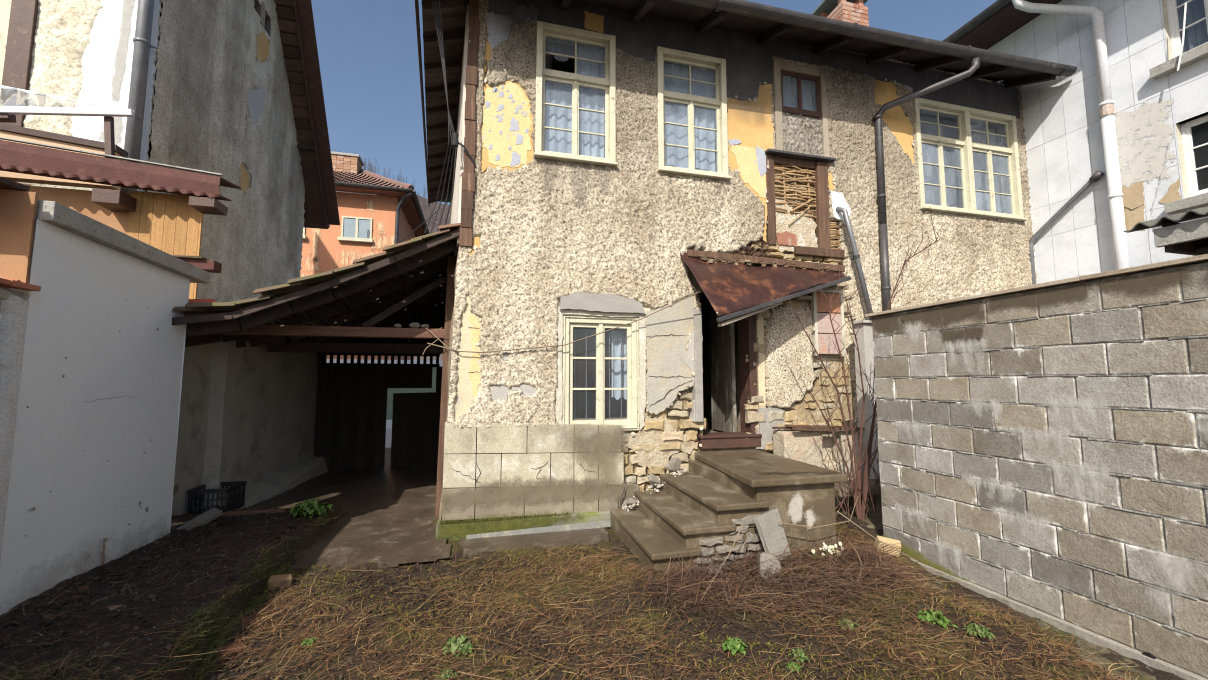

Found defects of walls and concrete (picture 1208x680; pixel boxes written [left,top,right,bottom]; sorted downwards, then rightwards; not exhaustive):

flaking render [256,31,271,64]
flaking render [476,0,539,173]
flaking render [727,82,843,267]
flaking render [874,78,915,164]
flaking render [1115,98,1181,231]
flaking render [452,295,483,419]
spalling [745,282,847,366]
spalling [744,347,855,451]
flaking render [788,493,816,529]